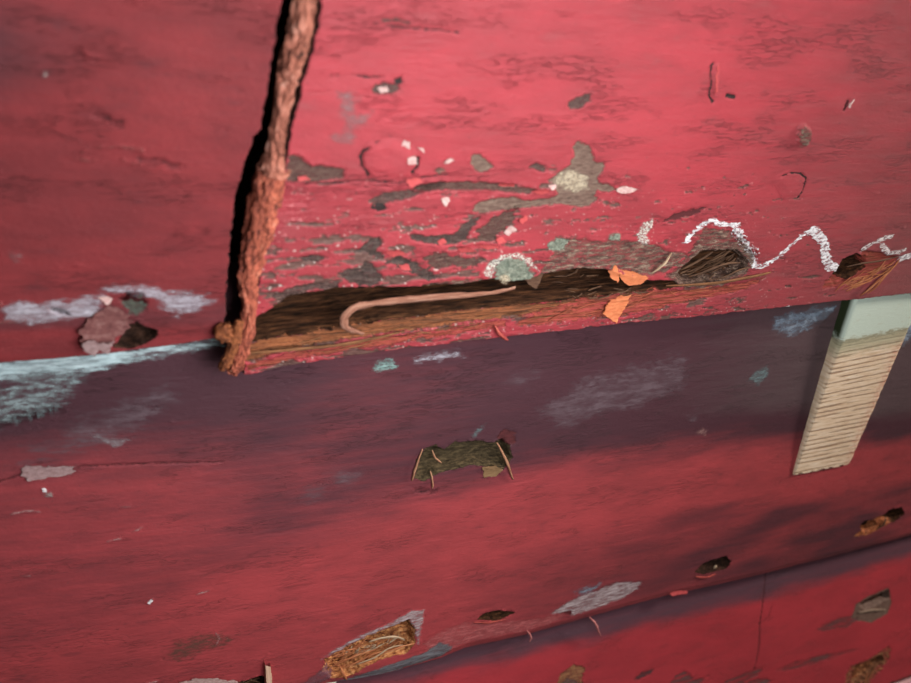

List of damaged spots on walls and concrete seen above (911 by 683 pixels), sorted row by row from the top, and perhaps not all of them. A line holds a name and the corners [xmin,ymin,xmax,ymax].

spalling [252,141,750,342]
peeling [78,294,158,357]
peeling [0,465,75,482]
hole [414,439,513,481]
hole [882,507,905,522]
spalling [695,556,732,574]
spalling [322,582,640,678]
peeling [557,665,585,683]